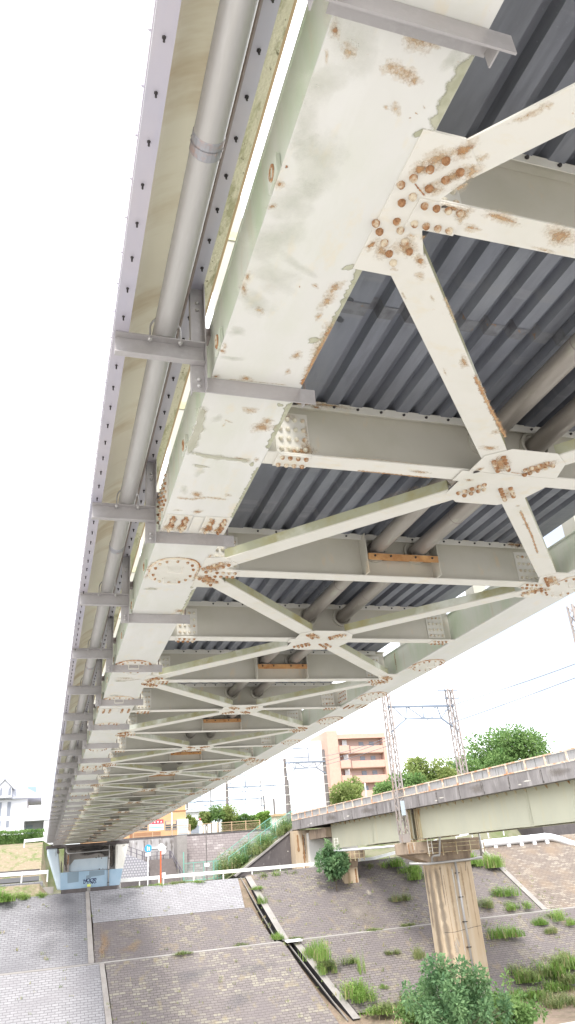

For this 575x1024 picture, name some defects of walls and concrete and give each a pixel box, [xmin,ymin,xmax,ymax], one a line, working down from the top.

rust [415,145,481,195]
rust [474,375,507,437]
rust [178,556,227,584]